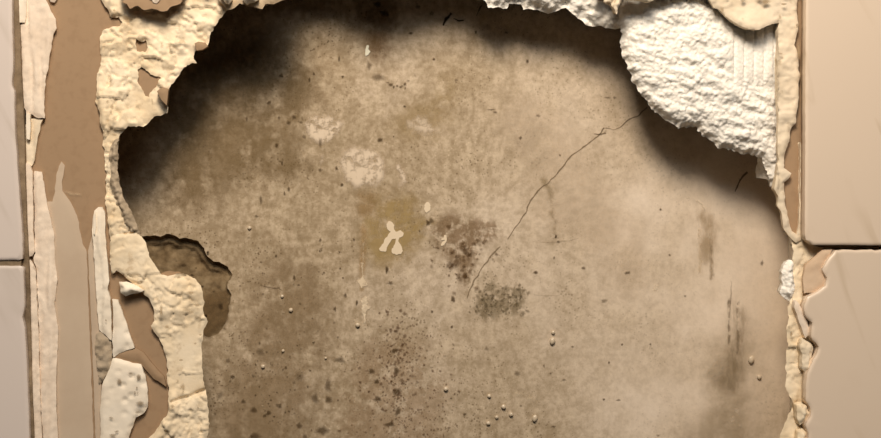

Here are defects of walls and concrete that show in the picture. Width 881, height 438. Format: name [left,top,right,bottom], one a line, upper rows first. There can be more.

flaking render [603,0,653,14]
peeling [47,162,94,438]
spalling [95,0,233,438]
damp [438,219,493,279]
crack [467,108,647,298]
flaking render [708,0,834,438]